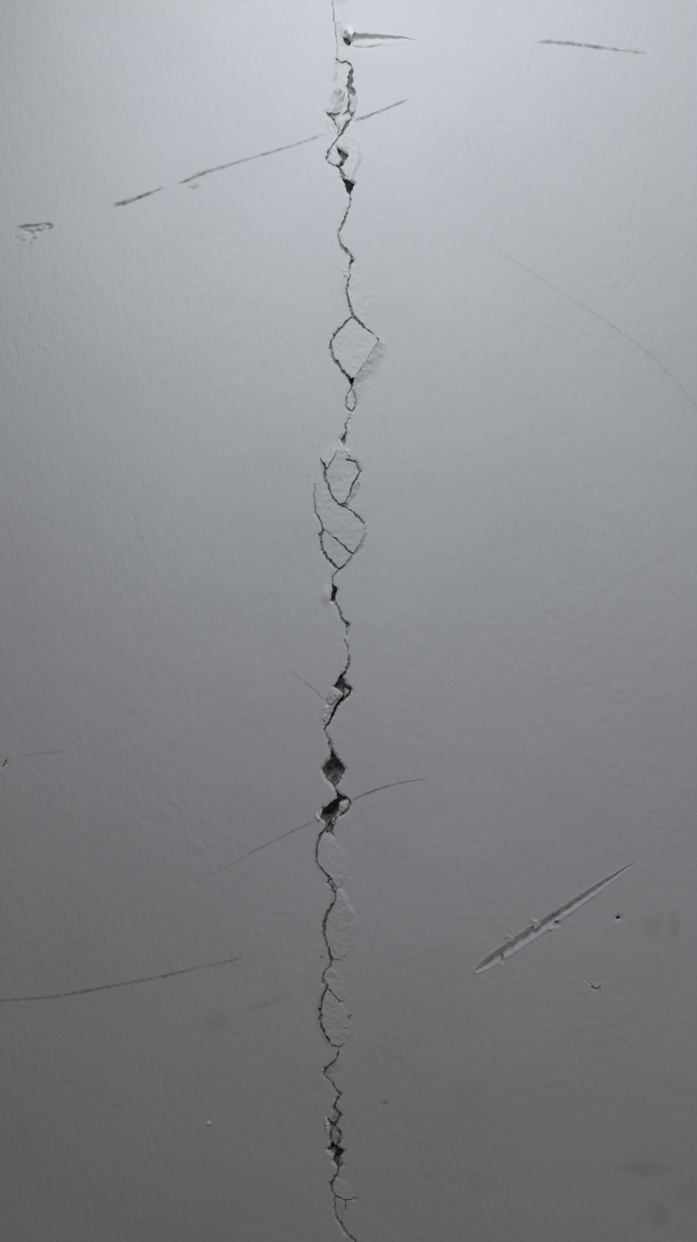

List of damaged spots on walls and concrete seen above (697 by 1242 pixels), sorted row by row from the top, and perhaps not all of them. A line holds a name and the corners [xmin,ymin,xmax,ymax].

crack [313,0,388,1242]
spalling [475,861,636,972]